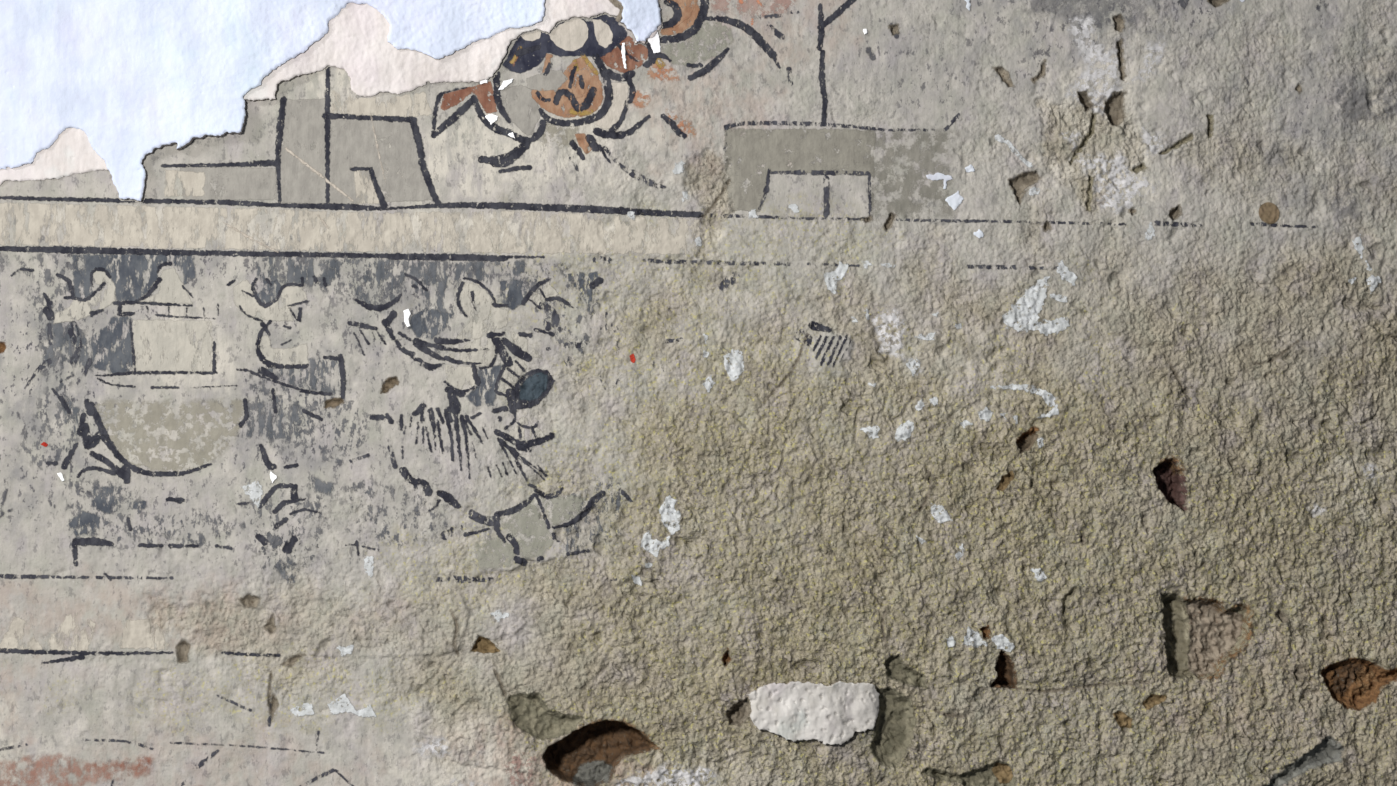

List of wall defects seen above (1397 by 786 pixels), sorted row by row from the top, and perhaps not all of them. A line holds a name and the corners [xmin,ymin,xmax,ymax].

spalling [995,67,1013,87]
flaking render [0,0,662,202]
spalling [864,213,895,229]
peeling [824,260,897,294]
peeling [703,334,744,392]
spalling [380,376,399,394]
peeling [859,397,938,442]
peeling [242,472,277,508]
peeling [631,495,681,586]
spalling [238,595,260,608]
spalling [175,641,190,663]
spalling [471,636,500,653]